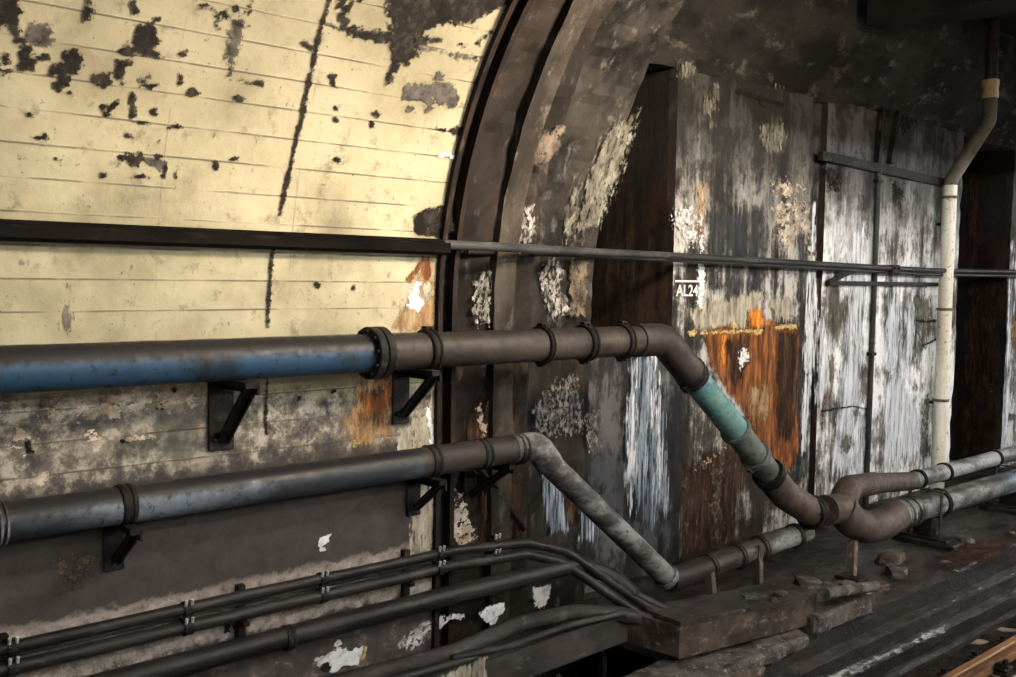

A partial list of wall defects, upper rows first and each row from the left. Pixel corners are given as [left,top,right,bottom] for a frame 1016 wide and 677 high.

peeling [0,0,164,138]
peeling [117,151,177,179]
crack [278,0,356,216]
peeling [336,0,509,114]
leakage [562,112,640,245]
crack [262,378,270,435]
crack [265,250,275,328]
rust [343,374,393,448]
leakage [624,356,750,557]
rust [704,304,801,474]
leakage [793,202,870,484]
peeling [315,639,368,673]